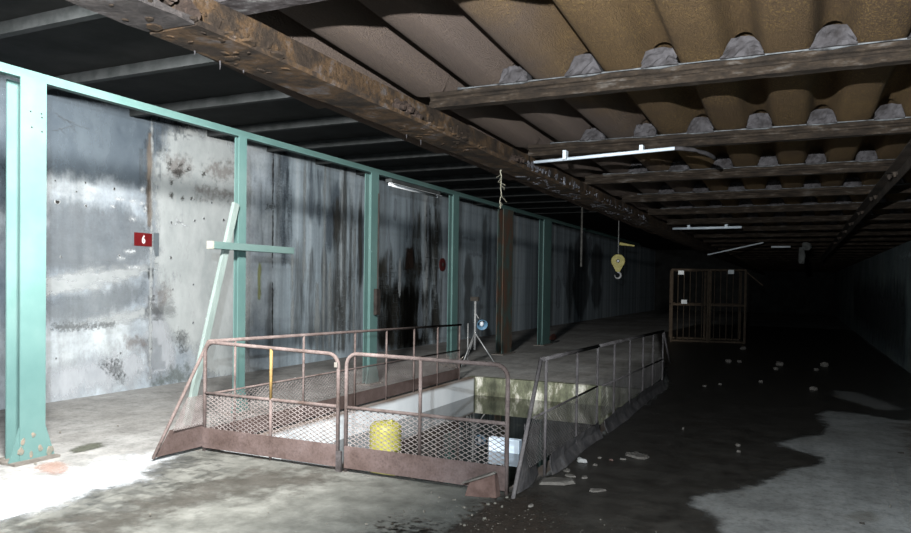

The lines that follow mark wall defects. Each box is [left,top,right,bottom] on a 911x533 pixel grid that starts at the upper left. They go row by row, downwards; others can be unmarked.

leakage [46,89,235,400]
leakage [272,151,306,287]
leakage [303,162,364,353]
leakage [378,191,442,351]
leakage [0,281,911,533]